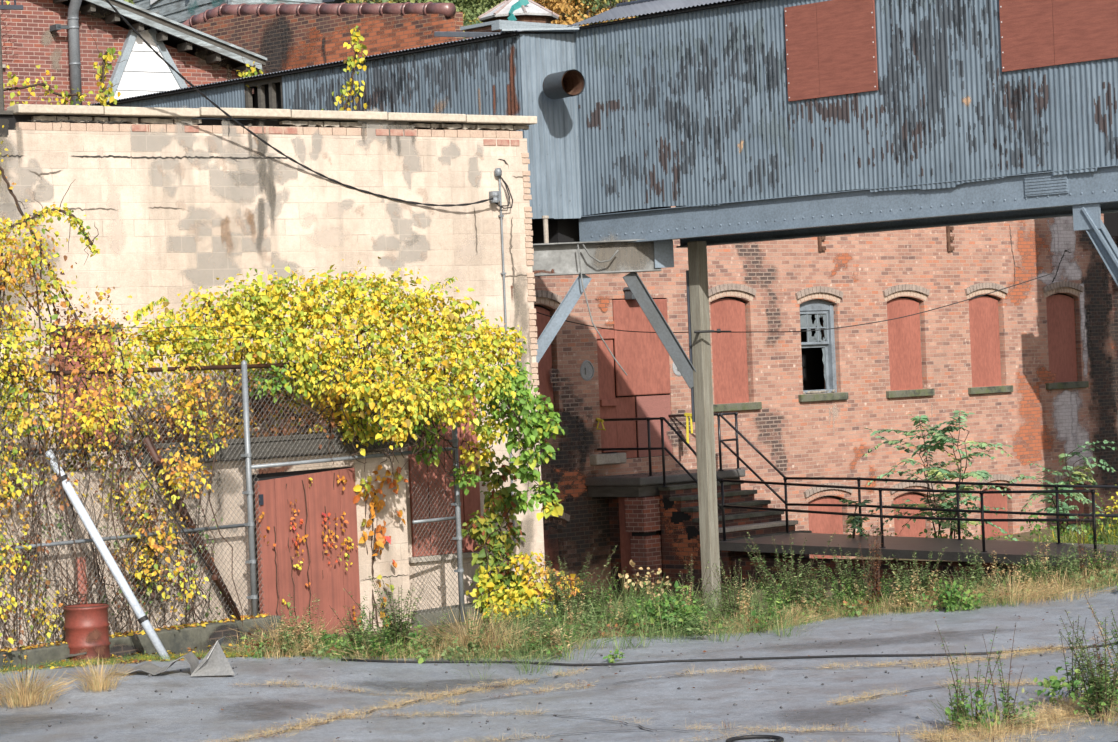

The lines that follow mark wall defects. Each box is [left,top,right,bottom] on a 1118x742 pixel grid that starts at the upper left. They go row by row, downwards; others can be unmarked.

crack [0,119,287,175]
leakage [248,124,276,248]
peeling [281,14,520,186]
leakage [387,121,415,152]
rust [493,46,519,116]
peeling [578,0,1118,204]
spalling [1014,367,1055,465]
leakage [1037,216,1118,496]